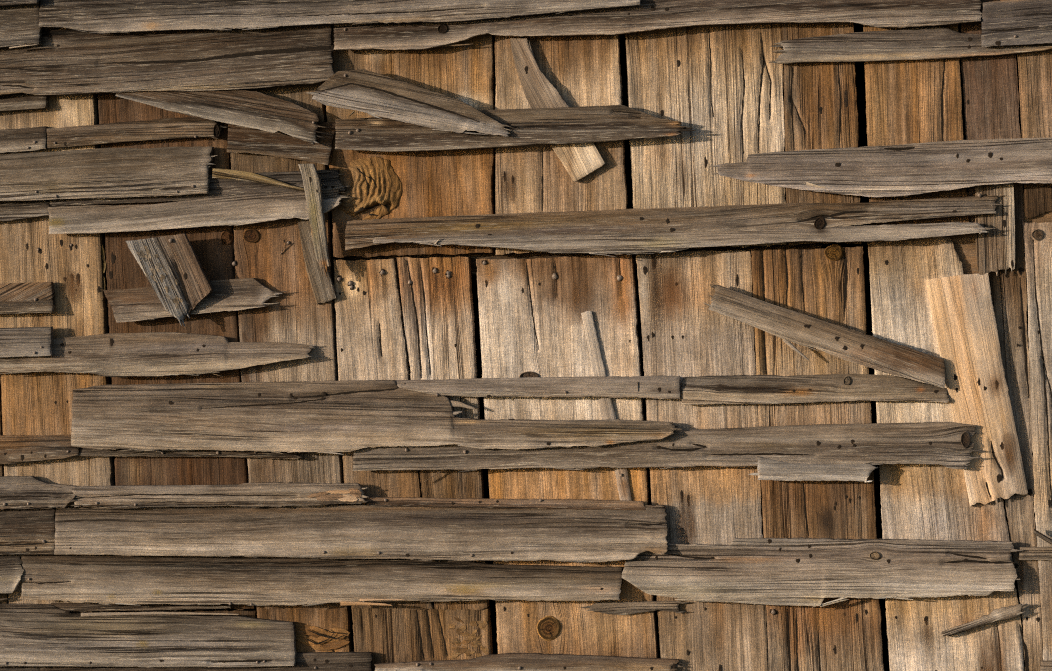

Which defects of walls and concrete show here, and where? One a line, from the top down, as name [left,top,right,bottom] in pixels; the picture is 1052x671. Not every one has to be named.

crack [706,29,714,114]
crack [741,32,805,154]
crack [1020,245,1052,503]